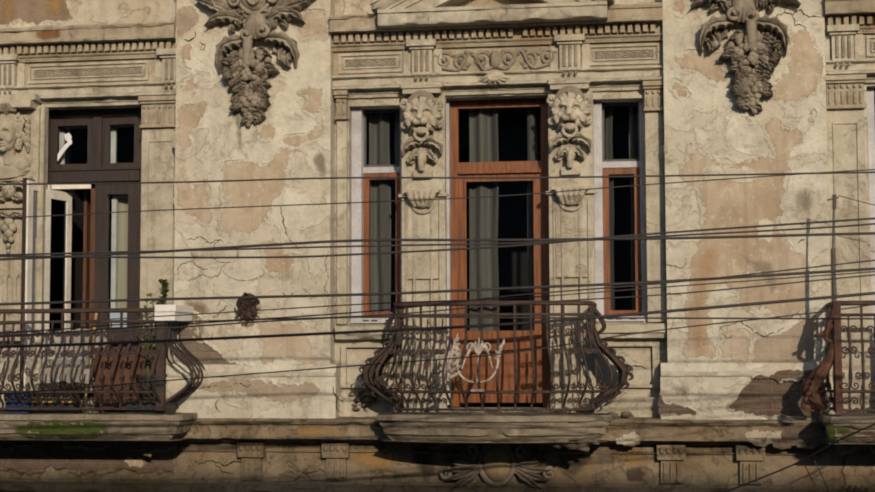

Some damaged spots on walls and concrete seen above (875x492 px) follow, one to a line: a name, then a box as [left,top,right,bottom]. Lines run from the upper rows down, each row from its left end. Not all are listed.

flaking render [0,0,106,44]
peeling [172,3,212,155]
crack [177,236,238,281]
peeling [173,84,330,282]
peeling [657,24,875,470]
flaking render [177,292,323,406]